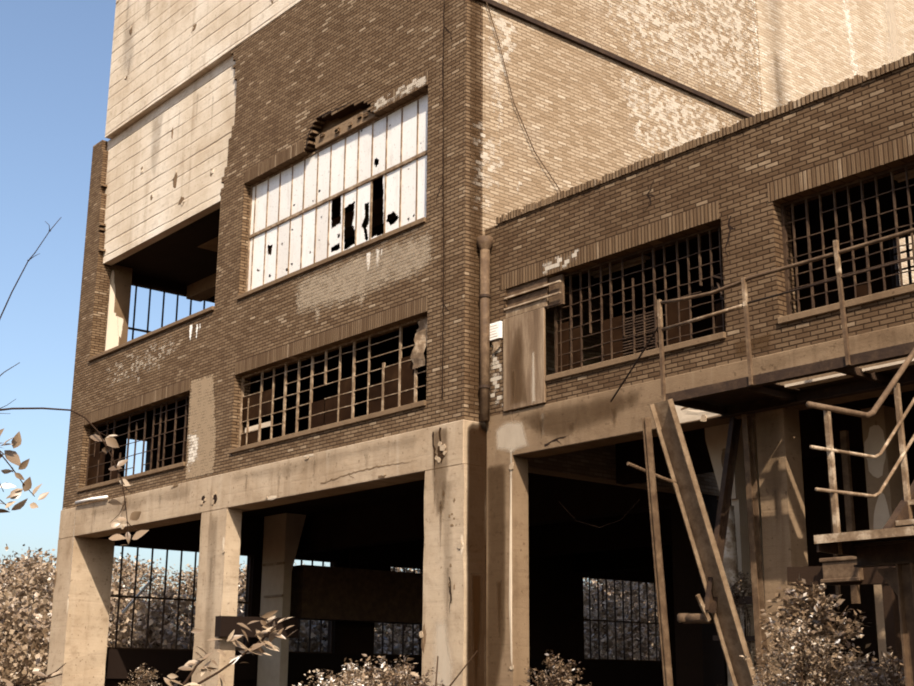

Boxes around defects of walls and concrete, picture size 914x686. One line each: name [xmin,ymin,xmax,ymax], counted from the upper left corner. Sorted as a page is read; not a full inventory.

crack [436,2,452,400]
crack [321,427,441,484]
damp [437,626,449,686]